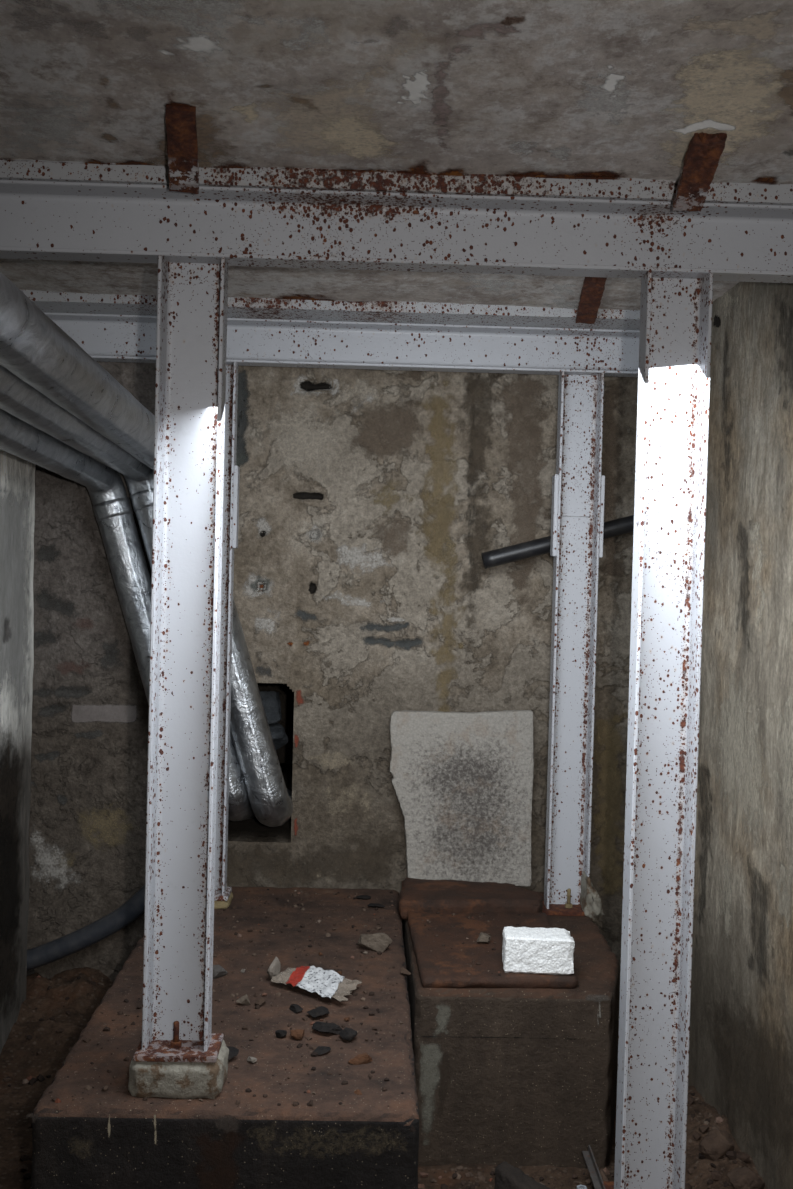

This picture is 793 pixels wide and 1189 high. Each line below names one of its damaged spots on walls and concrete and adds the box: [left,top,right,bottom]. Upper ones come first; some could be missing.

rust [340,162,468,176]
rust [501,171,624,180]
rust [753,177,777,185]